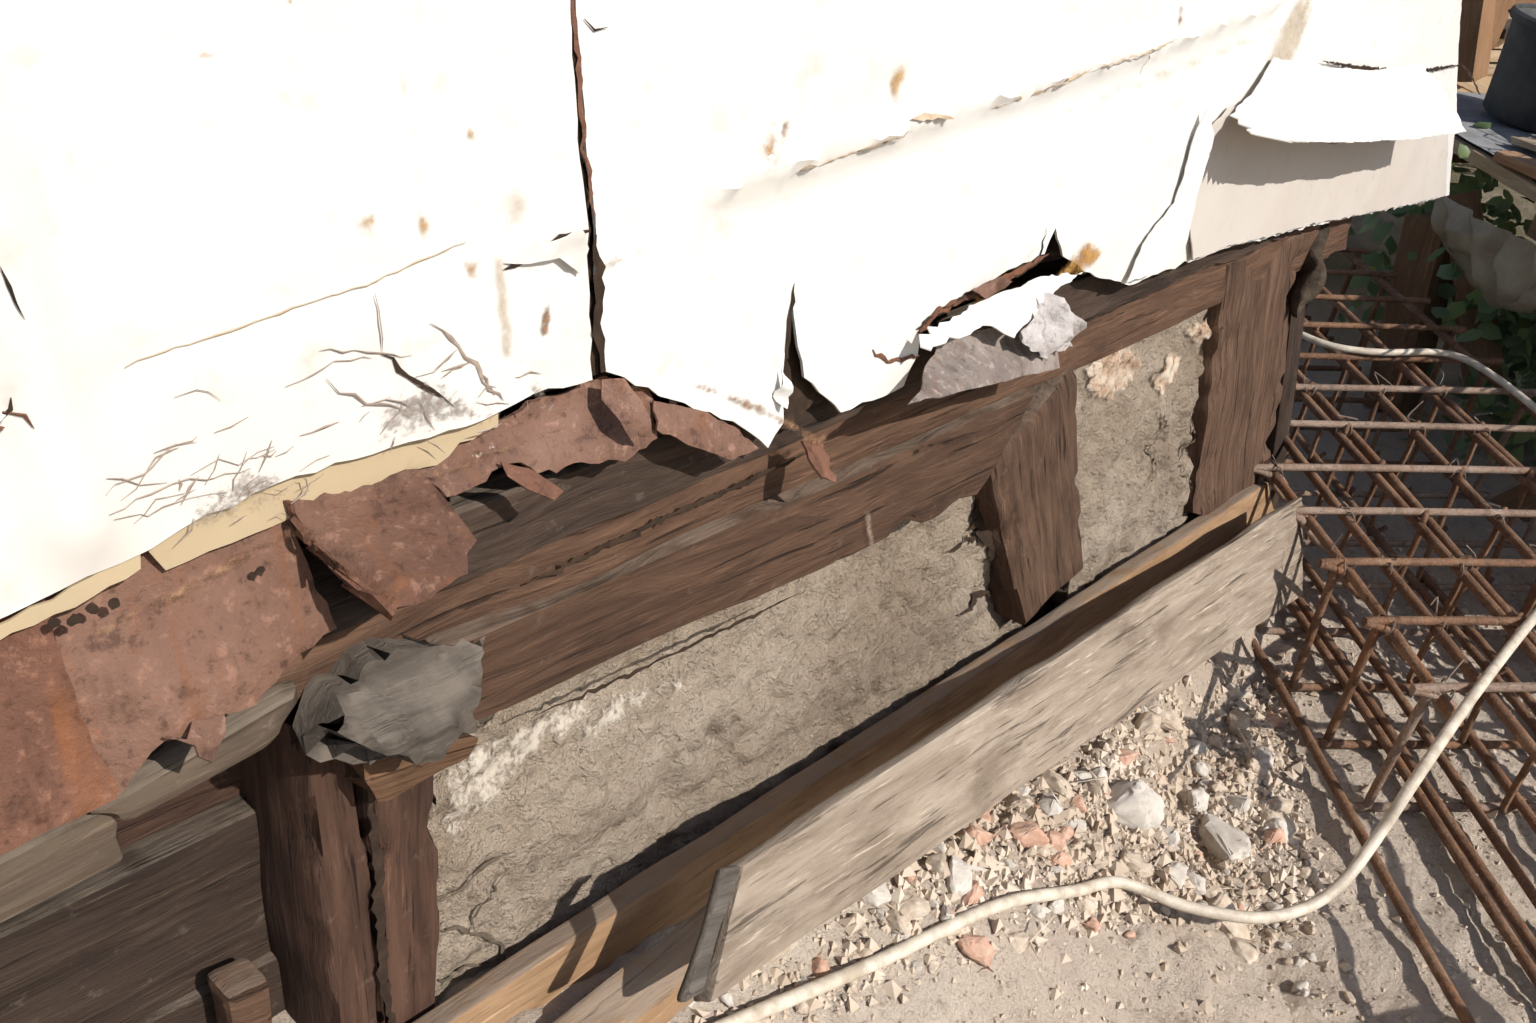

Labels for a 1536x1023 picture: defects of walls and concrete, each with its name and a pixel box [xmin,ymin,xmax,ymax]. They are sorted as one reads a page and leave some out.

crack [504,0,608,375]
peeling [972,276,1013,299]
peeling [1186,320,1211,344]
crack [106,242,552,546]
peeling [773,369,793,409]
peeling [1086,348,1181,400]
corrosion [781,419,837,482]
corrosion [0,375,759,855]
crack [535,590,806,715]